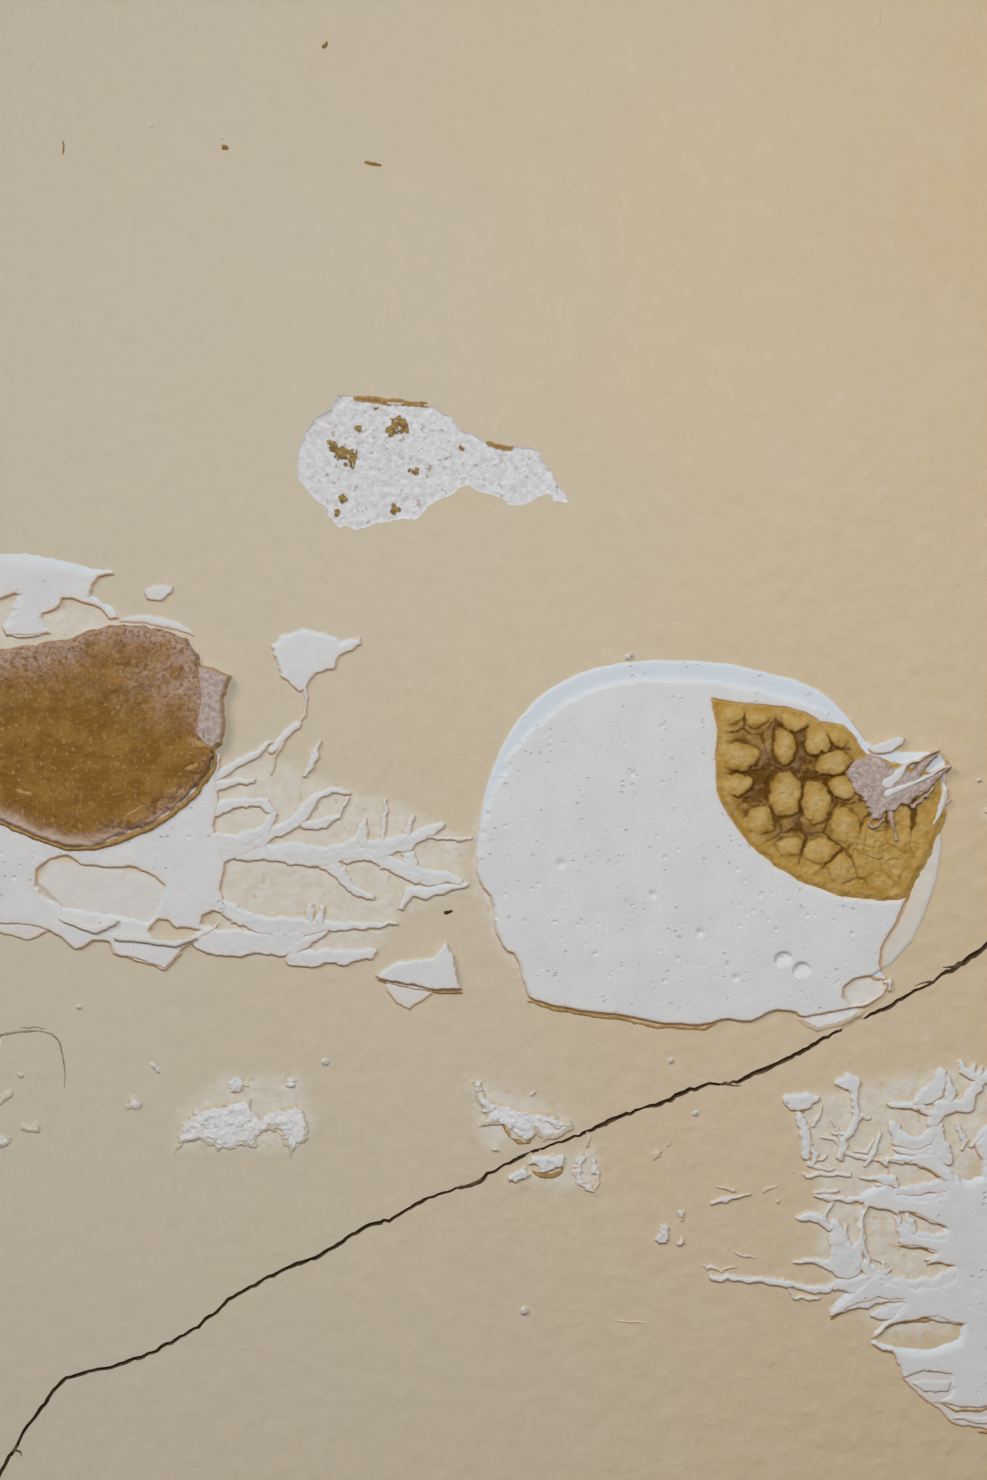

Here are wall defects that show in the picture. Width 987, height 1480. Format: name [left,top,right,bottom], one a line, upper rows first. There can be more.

peeling [296,395,568,530]
peeling [0,553,952,1032]
crack [0,942,987,1477]
peeling [708,1057,987,1434]